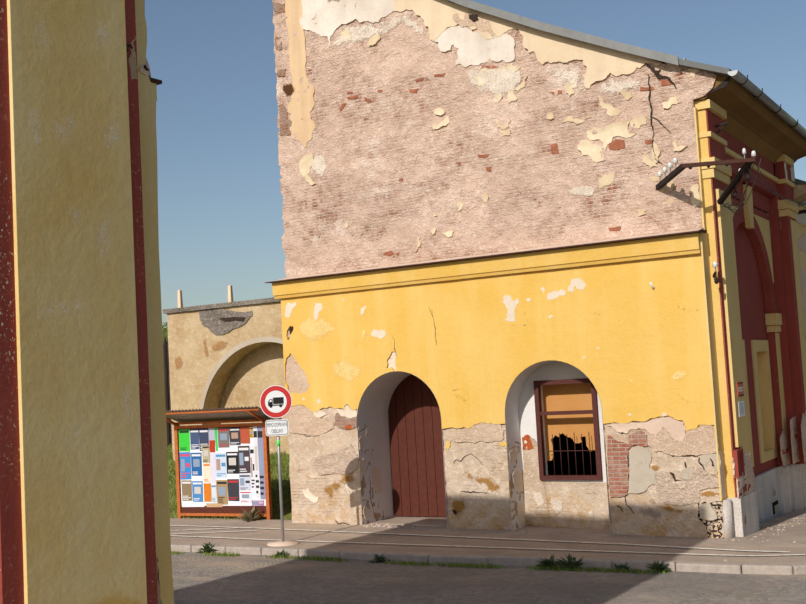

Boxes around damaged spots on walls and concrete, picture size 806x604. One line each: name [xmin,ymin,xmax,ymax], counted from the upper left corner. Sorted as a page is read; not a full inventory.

spalling [272,0,717,280]
crack [646,62,676,164]
peeling [503,295,531,322]
peeling [541,278,586,300]
spalling [284,354,384,525]
spalling [443,423,549,531]
spalling [604,413,755,538]
spalling [780,411,806,466]